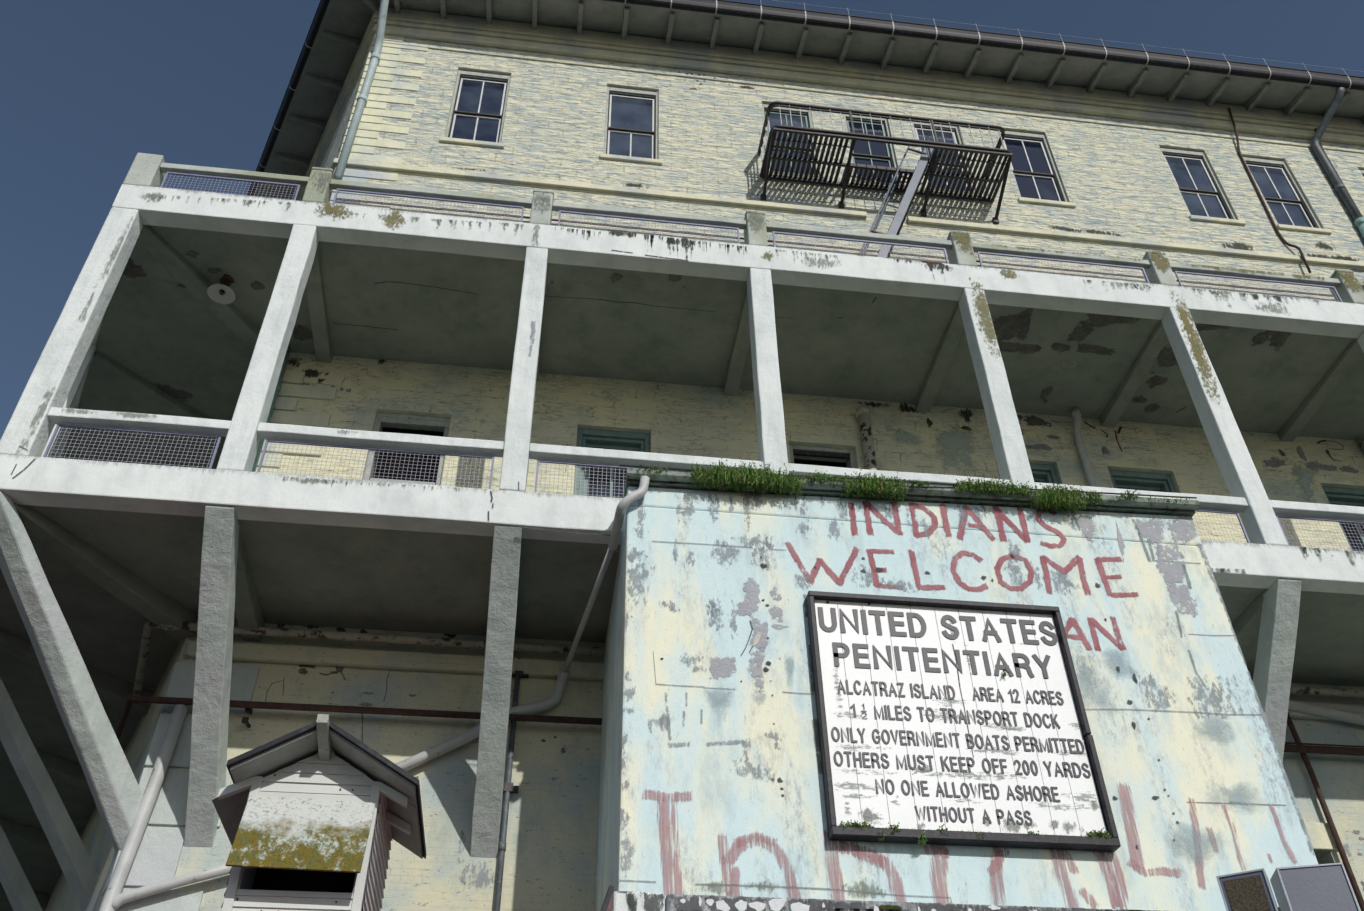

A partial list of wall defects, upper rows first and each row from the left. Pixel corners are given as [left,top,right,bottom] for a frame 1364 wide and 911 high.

peeling [1116,522,1125,562]
peeling [1135,516,1198,617]
peeling [709,556,787,696]
peeling [680,881,825,911]
peeling [842,880,886,911]